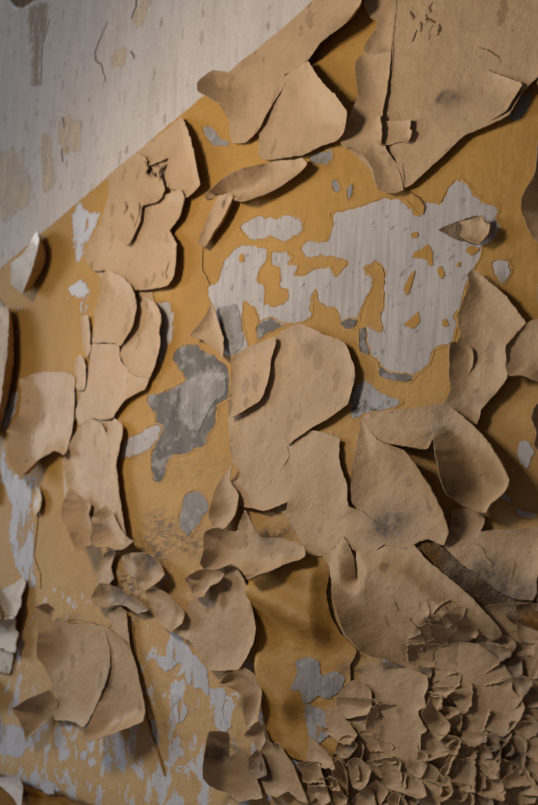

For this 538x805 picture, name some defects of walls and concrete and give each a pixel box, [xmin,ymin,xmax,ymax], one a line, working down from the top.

peeling [197,0,538,247]
flaking render [0,724,33,759]
flaking render [0,446,42,674]
peeling [0,778,62,805]
peeling [35,603,132,727]
flaking render [62,117,538,805]